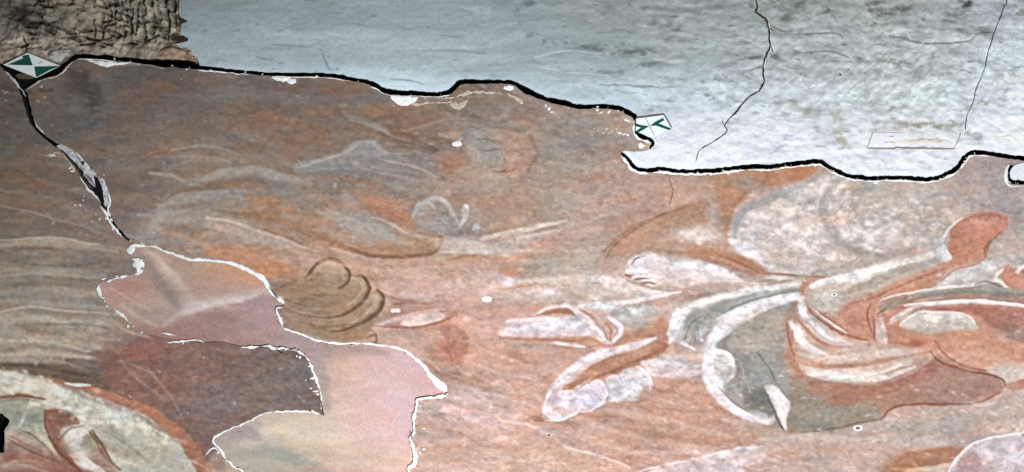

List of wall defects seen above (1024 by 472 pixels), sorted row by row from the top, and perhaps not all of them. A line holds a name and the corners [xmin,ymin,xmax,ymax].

flaking render [0,0,199,66]
peeling [411,90,523,110]
crack [0,0,1024,237]